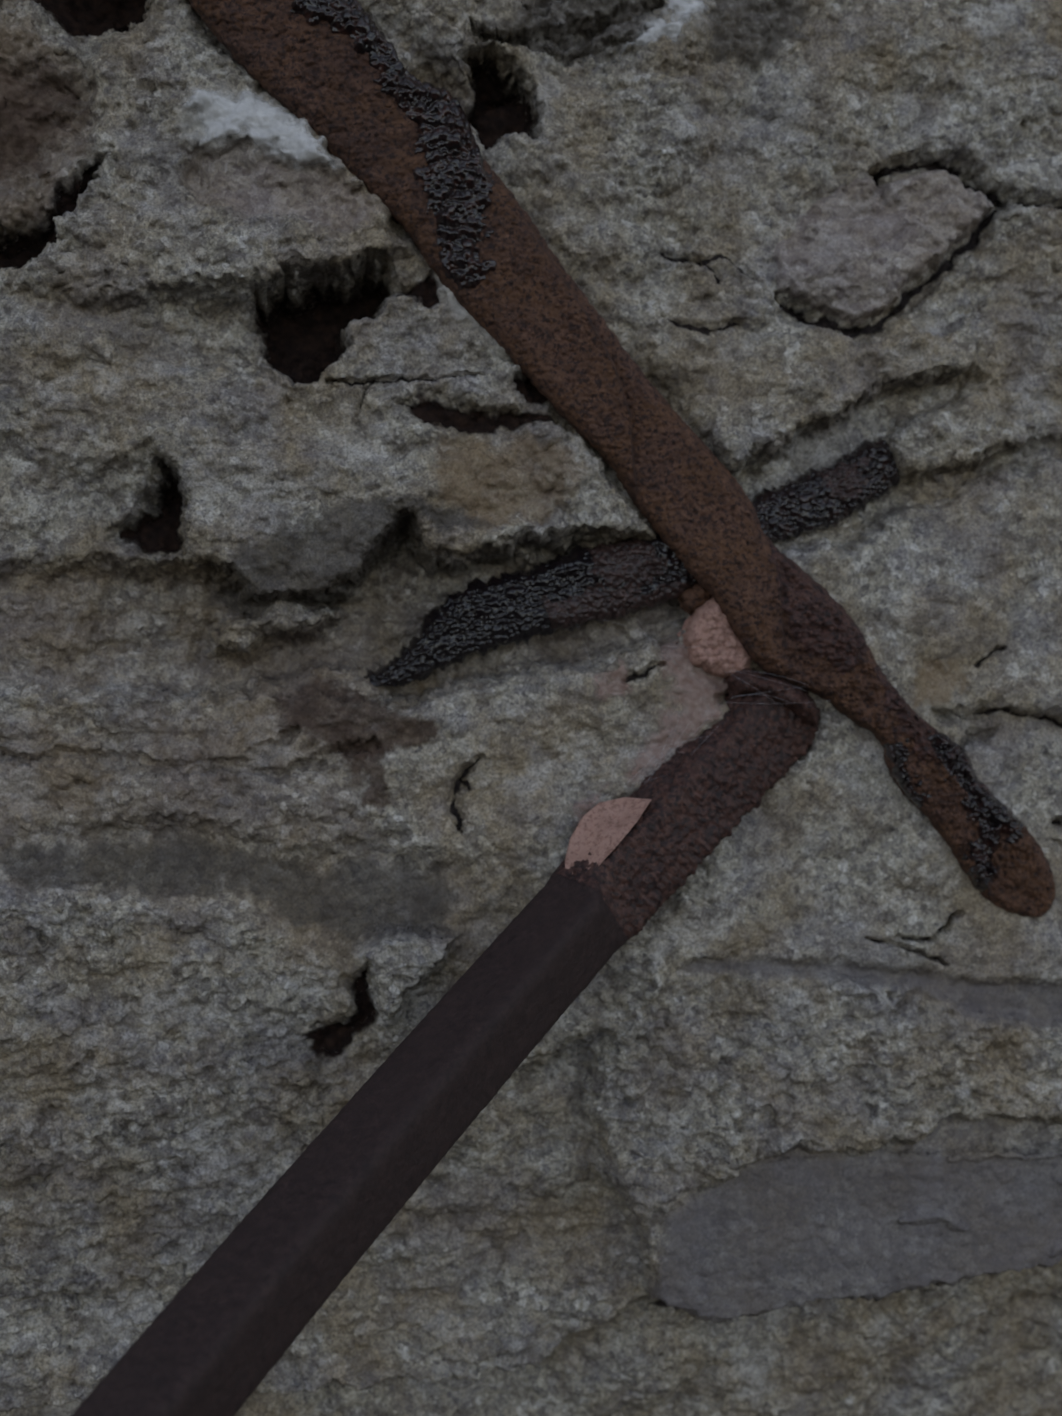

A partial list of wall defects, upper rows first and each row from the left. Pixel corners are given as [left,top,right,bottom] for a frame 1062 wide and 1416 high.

corrosion [677,583,712,615]
corrosion [275,677,436,807]
corrosion [630,641,728,779]